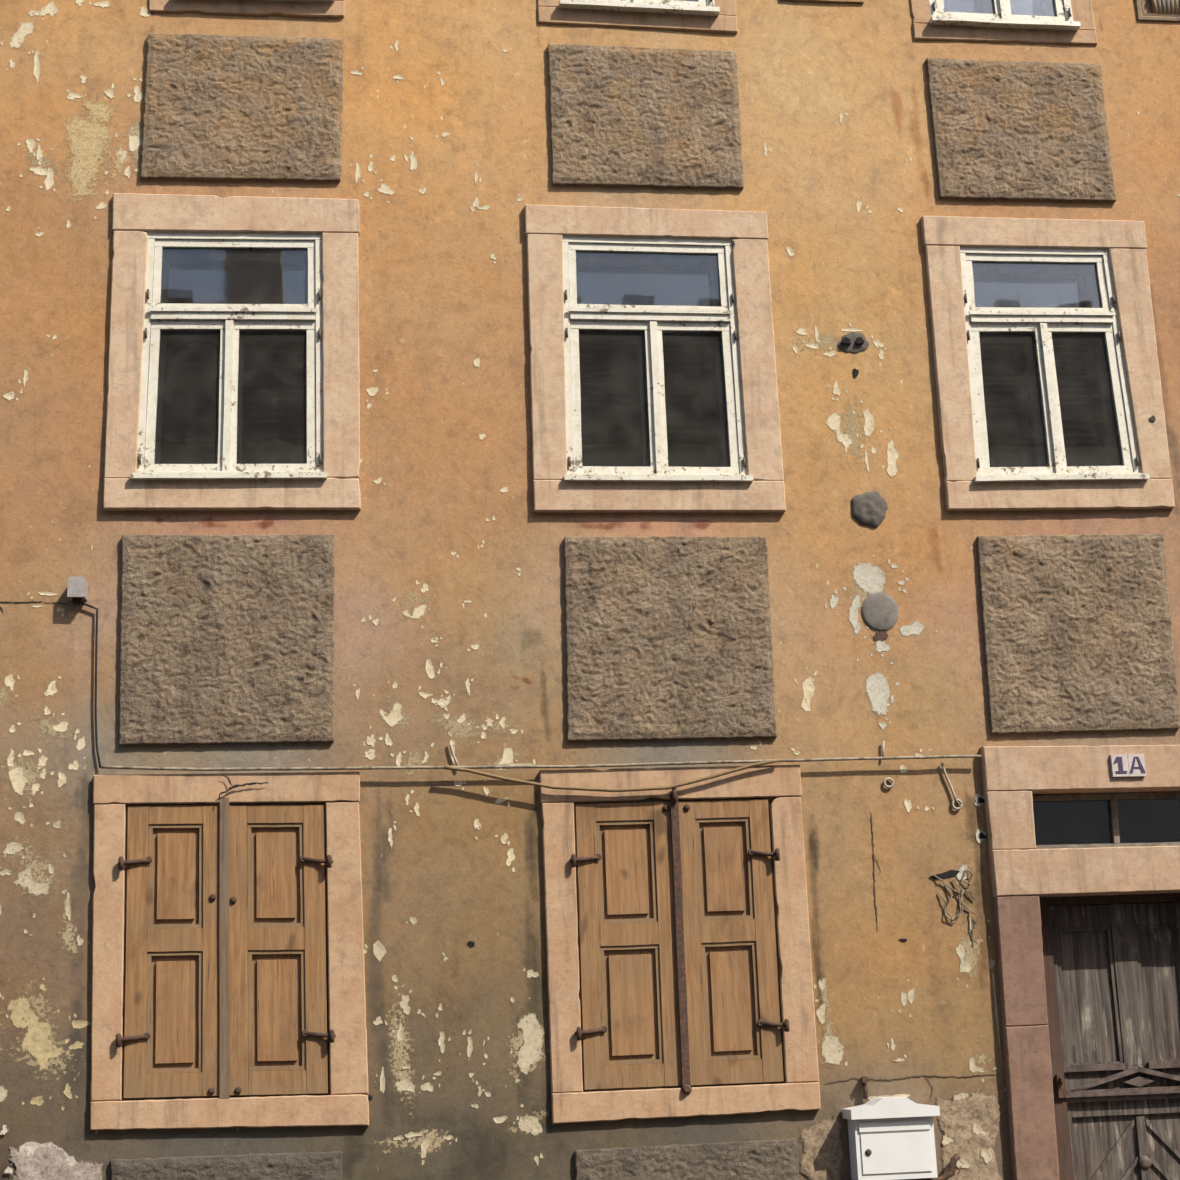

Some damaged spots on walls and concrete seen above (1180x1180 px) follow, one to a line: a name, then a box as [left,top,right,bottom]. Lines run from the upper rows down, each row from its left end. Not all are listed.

peeling [0,1,59,86]
peeling [17,75,143,228]
peeling [826,381,900,477]
peeling [825,548,938,730]
peeling [0,674,90,953]
crack [218,774,269,801]
peeling [353,659,536,816]
crack [870,812,881,931]
peeling [0,954,91,1111]
peeling [366,975,550,1165]
spalling [936,914,1006,1180]
spalling [0,1125,104,1180]